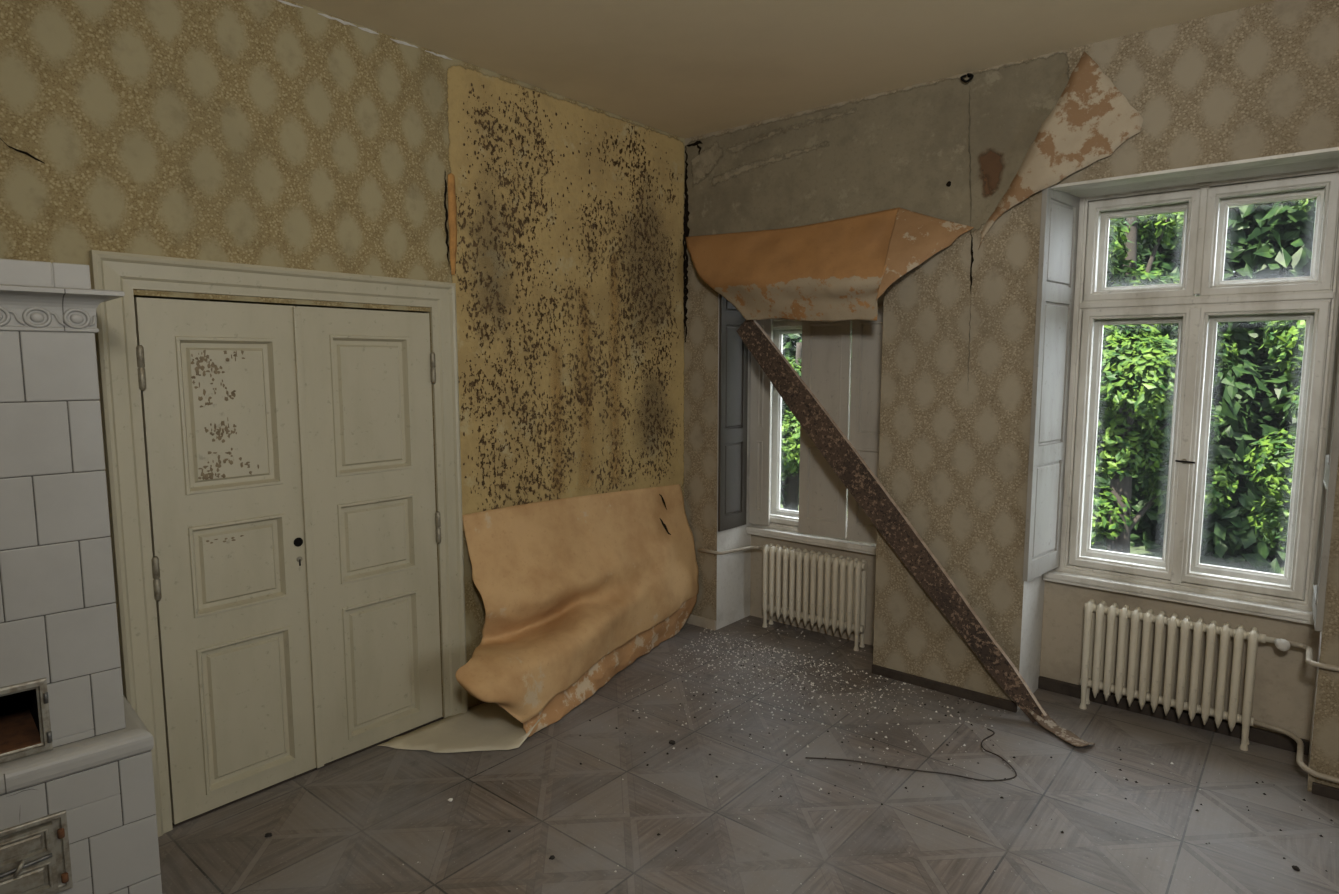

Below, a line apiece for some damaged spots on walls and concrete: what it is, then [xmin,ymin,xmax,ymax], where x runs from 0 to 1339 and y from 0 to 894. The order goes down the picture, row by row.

crack [0,138,44,163]
flaking render [318,13,1069,532]
peeling [191,350,245,408]
peeling [198,417,259,480]